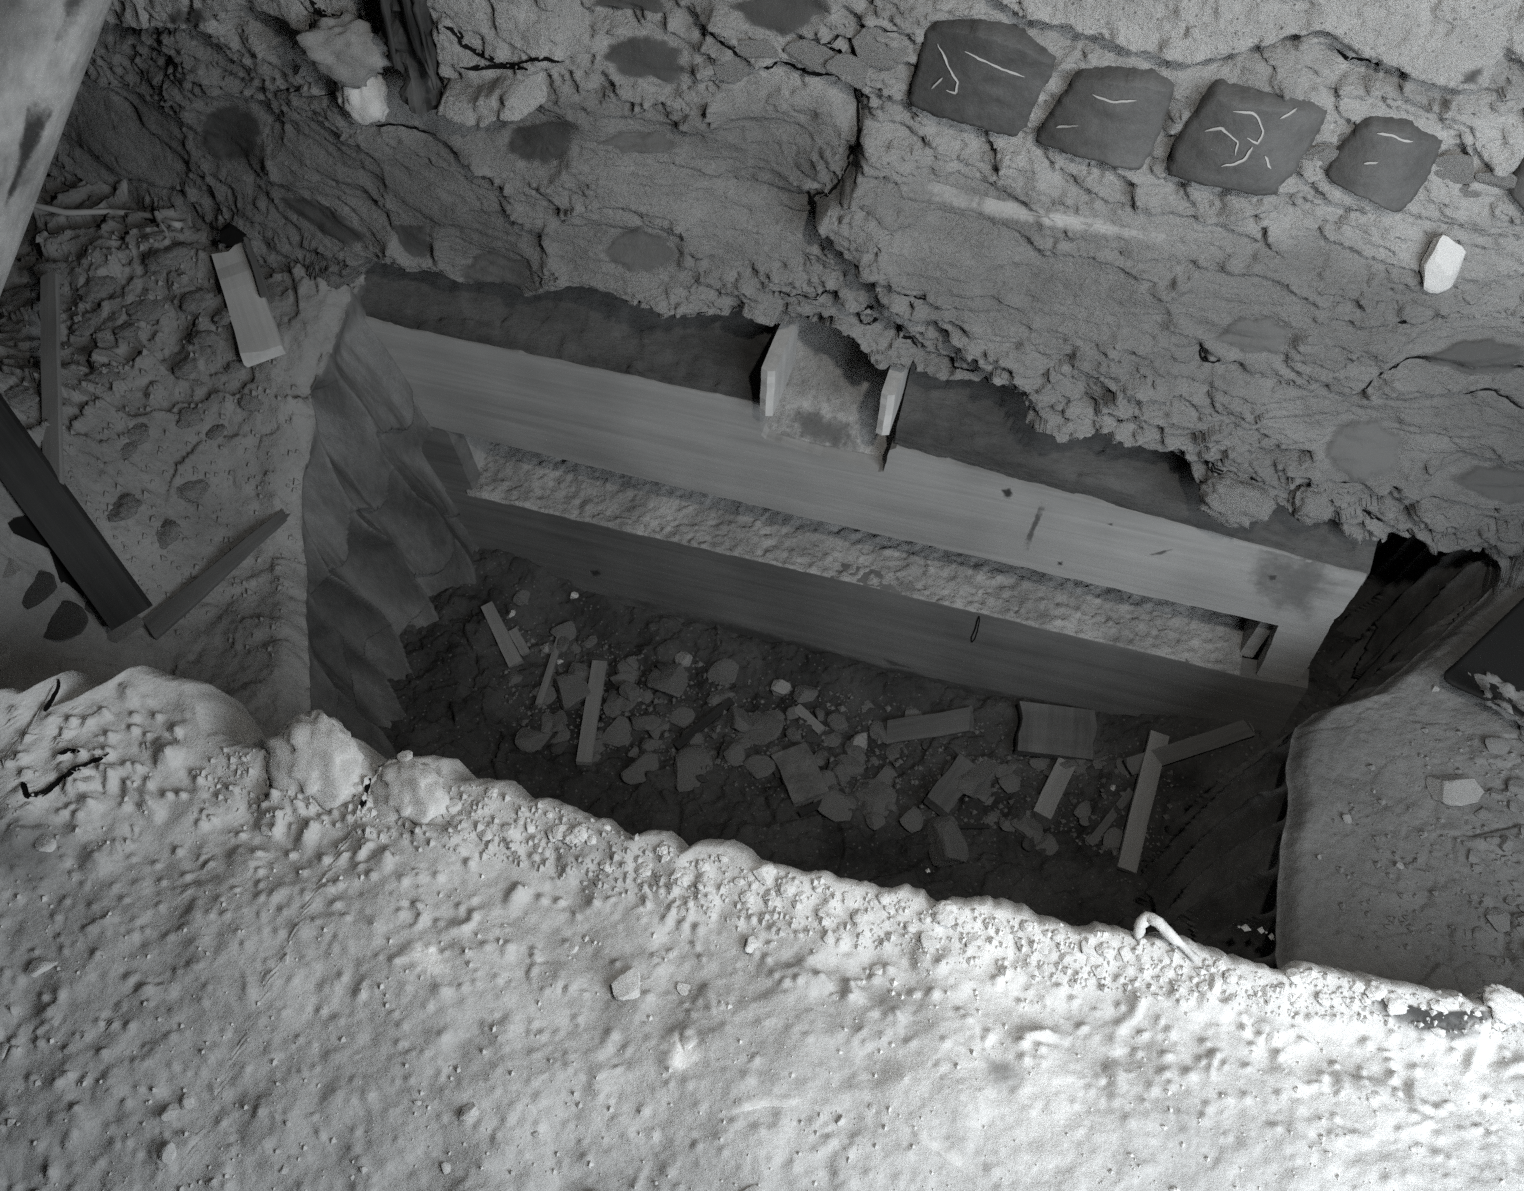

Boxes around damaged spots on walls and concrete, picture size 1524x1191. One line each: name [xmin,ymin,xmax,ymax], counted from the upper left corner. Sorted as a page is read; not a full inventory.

crack [154,48,202,87]
crack [443,26,565,71]
crack [1336,48,1383,70]
crack [276,88,336,96]
crack [690,9,898,205]
crack [375,123,435,135]
crack [782,290,828,300]
crack [860,294,952,347]